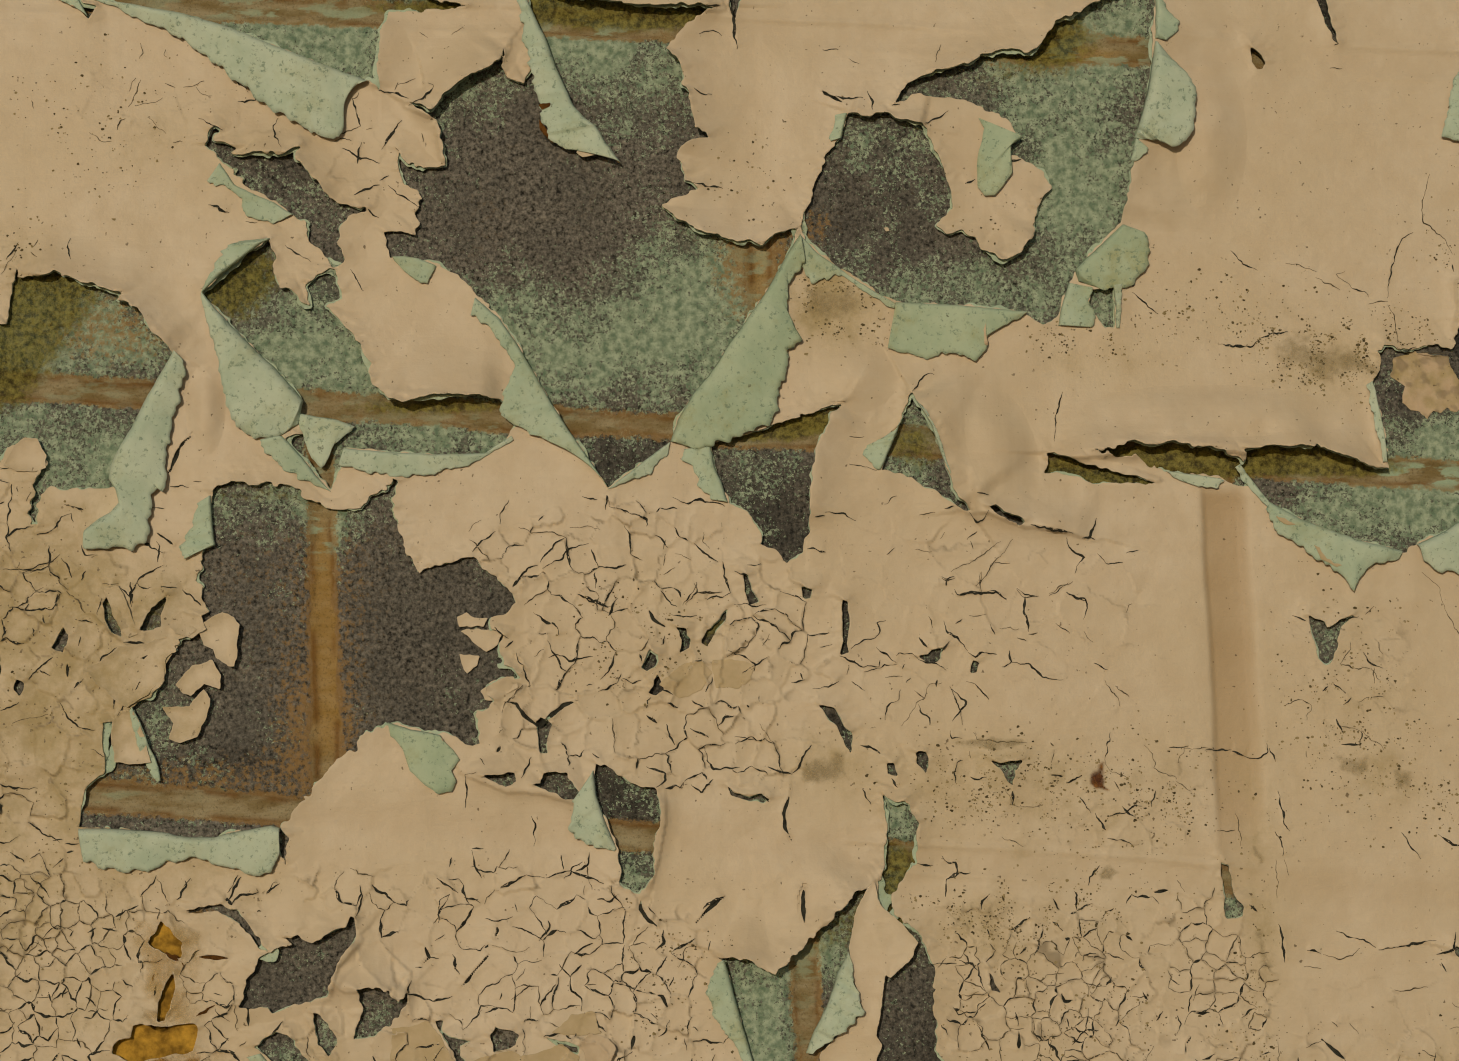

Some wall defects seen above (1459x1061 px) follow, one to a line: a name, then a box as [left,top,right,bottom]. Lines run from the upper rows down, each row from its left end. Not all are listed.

peeling [1317,0,1337,43]
peeling [0,270,186,551]
peeling [61,0,1197,876]
peeling [1044,328,1459,591]
water stain [2,740,99,911]
crack [0,437,217,757]
peeling [187,904,616,1061]
crack [334,816,728,1061]
peeling [705,795,944,1061]
crack [465,436,1459,1061]
peeling [1221,863,1244,919]
peeling [1309,616,1352,665]